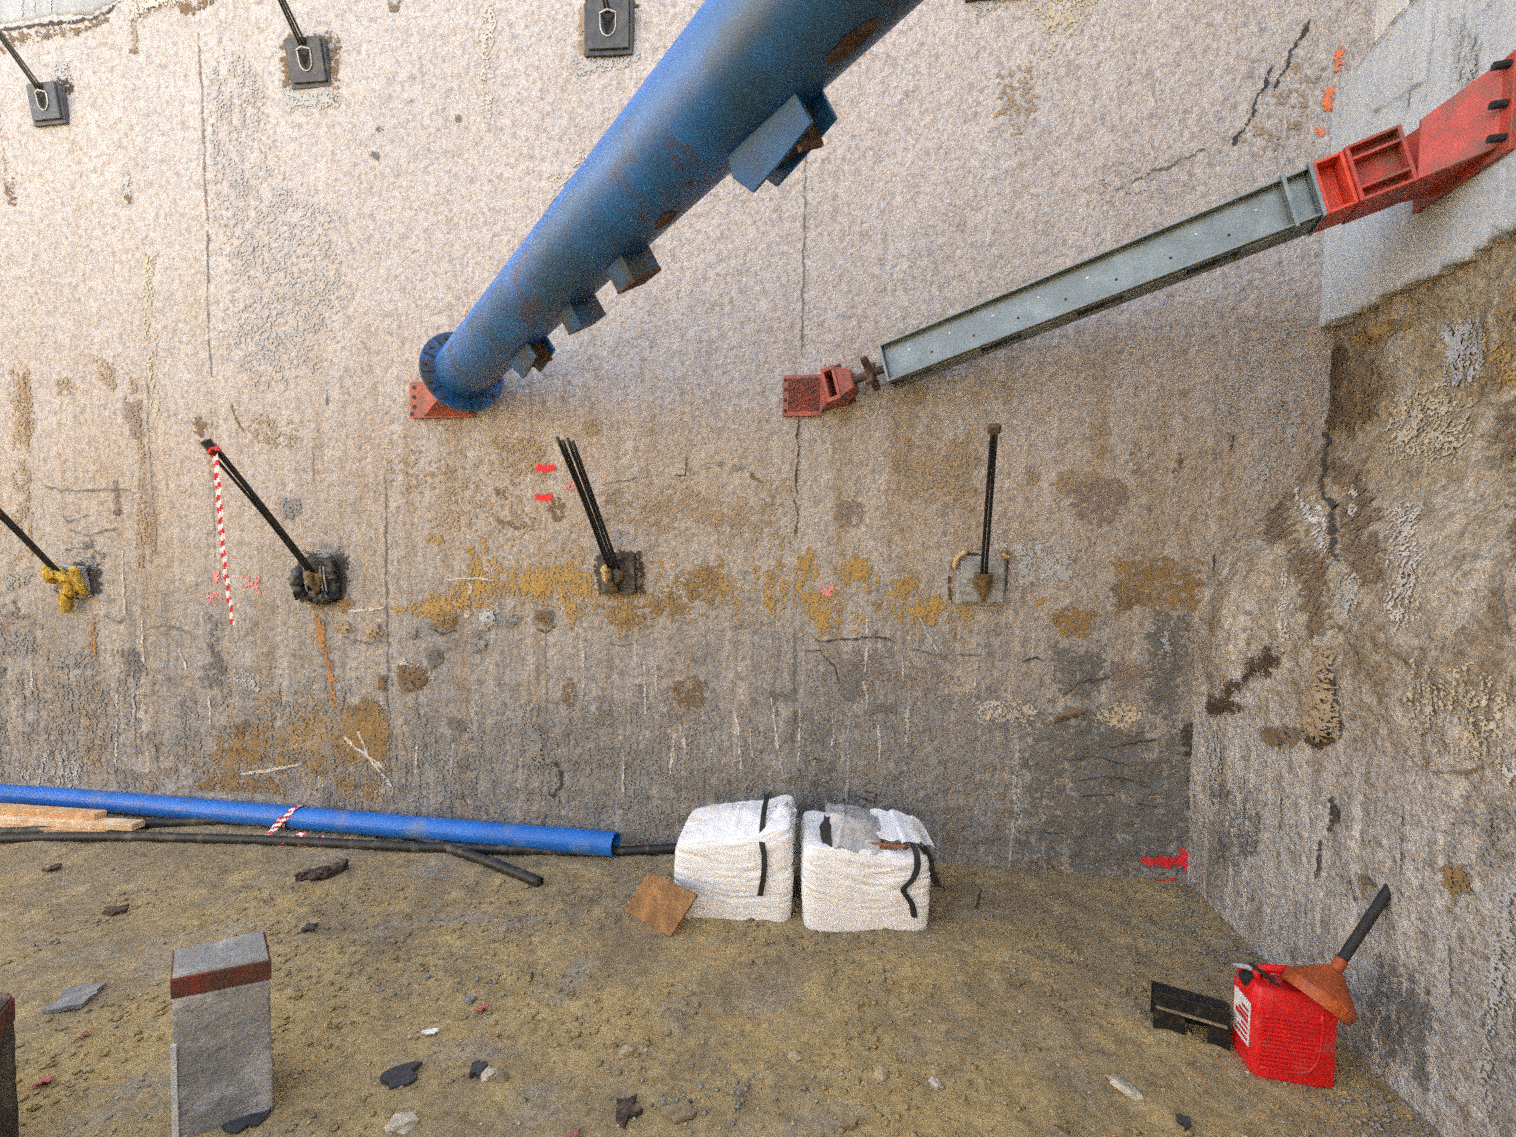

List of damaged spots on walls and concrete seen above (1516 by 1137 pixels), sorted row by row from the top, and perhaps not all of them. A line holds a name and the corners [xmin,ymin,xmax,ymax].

crack [1130,19,1311,183]
corrosion [313,613,336,710]